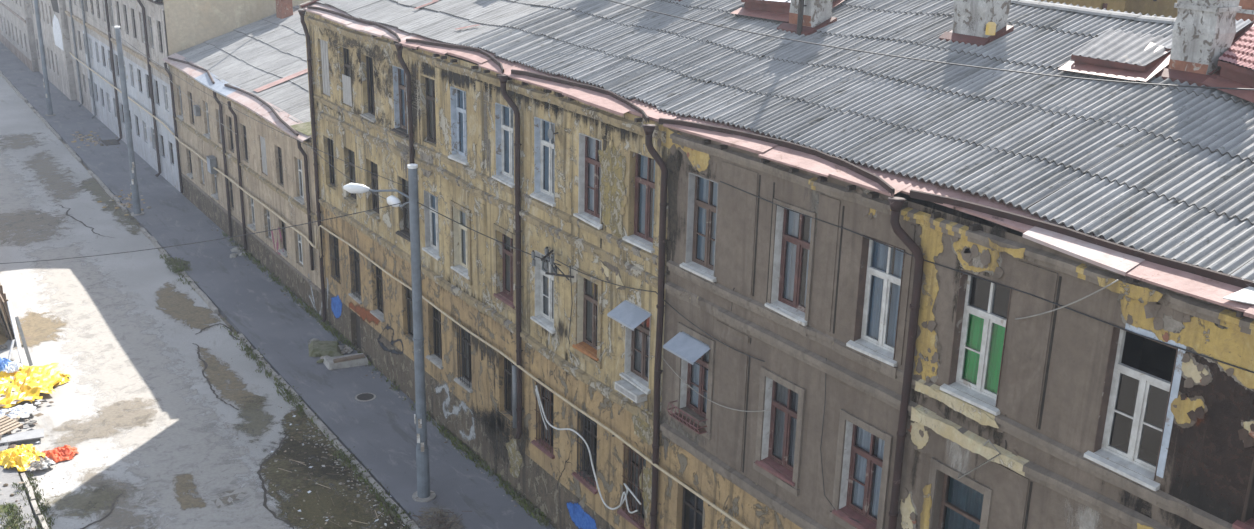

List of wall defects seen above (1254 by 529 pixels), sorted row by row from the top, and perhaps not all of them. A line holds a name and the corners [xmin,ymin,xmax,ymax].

flaking render [899,224,1026,529]
flaking render [1097,277,1254,428]
flaking render [1238,420,1254,448]